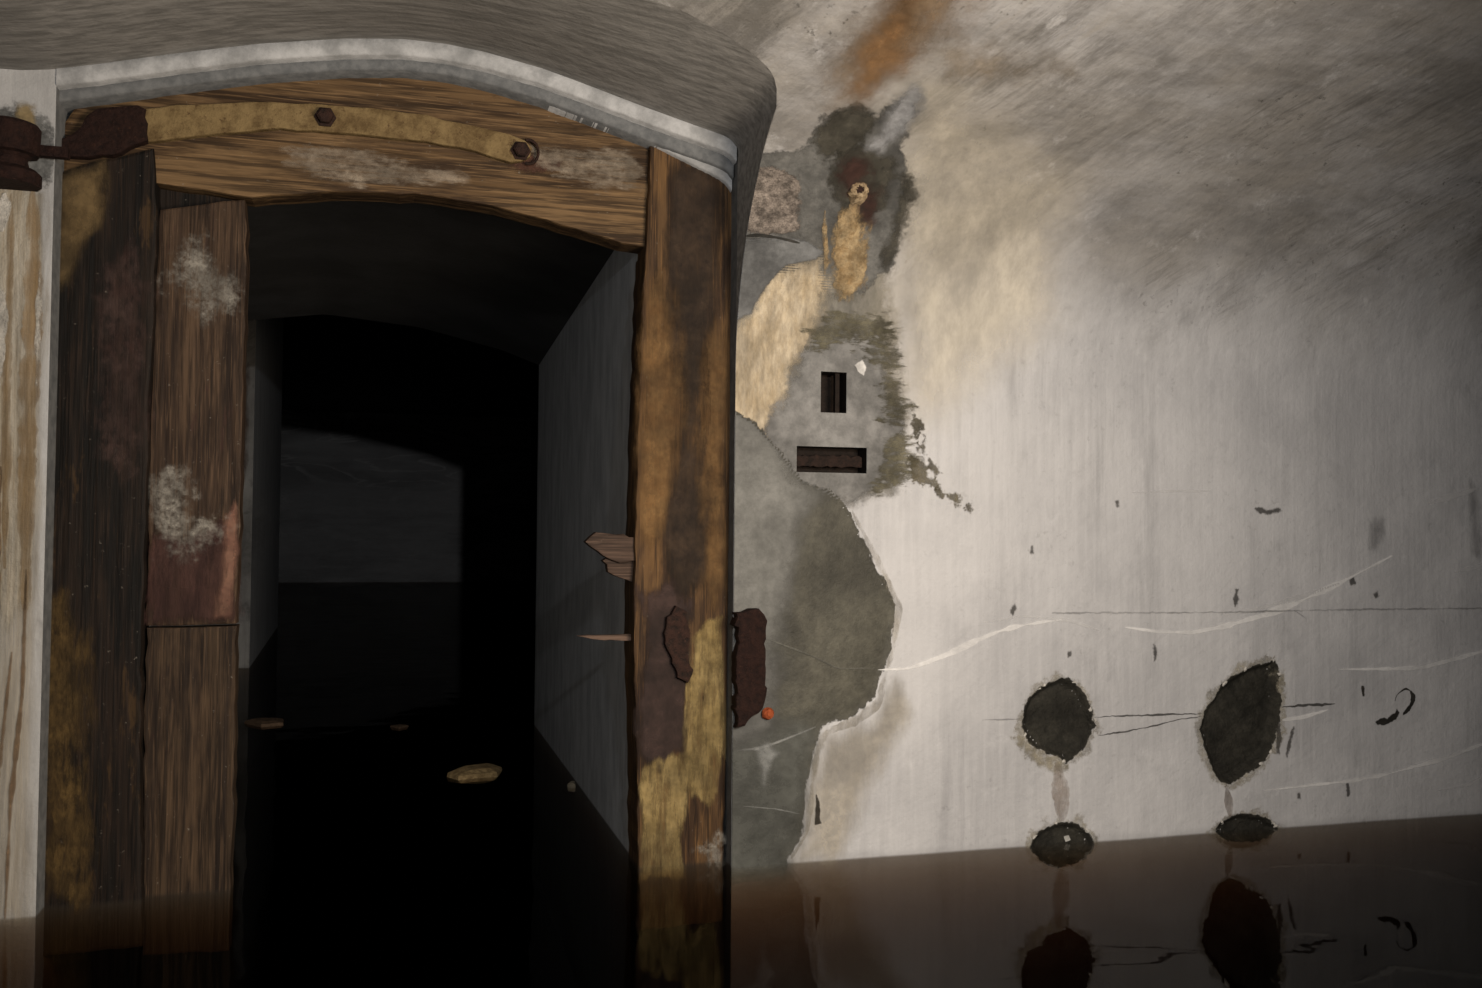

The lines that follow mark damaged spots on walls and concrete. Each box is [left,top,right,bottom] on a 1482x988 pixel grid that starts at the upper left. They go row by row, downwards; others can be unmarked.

corrosion [16,105,35,124]
flaking render [736,87,923,432]
corrosion [844,0,952,92]
corrosion [0,189,42,919]
peeling [731,390,895,880]